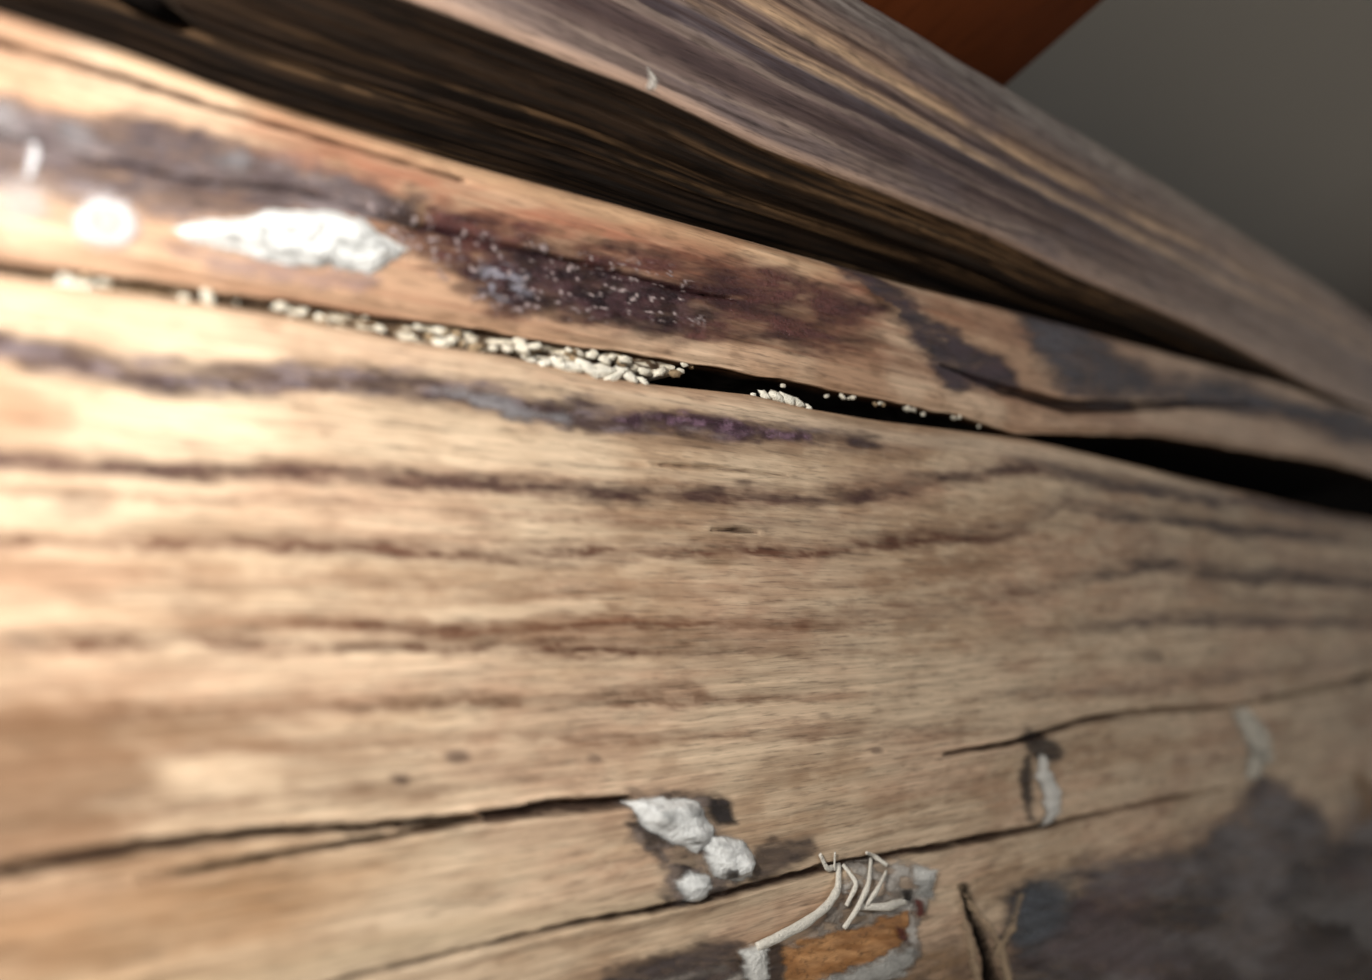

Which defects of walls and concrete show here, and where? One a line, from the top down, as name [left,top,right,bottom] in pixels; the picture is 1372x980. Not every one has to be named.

leakage [0,99,1018,391]
crack [0,266,1372,520]
crack [944,715,1116,755]
crack [0,796,628,879]
crack [498,816,1084,941]
leakage [1035,755,1062,827]
leakage [1007,777,1372,980]
leakage [602,942,749,980]
leakage [889,947,973,980]
crack [960,884,1023,980]